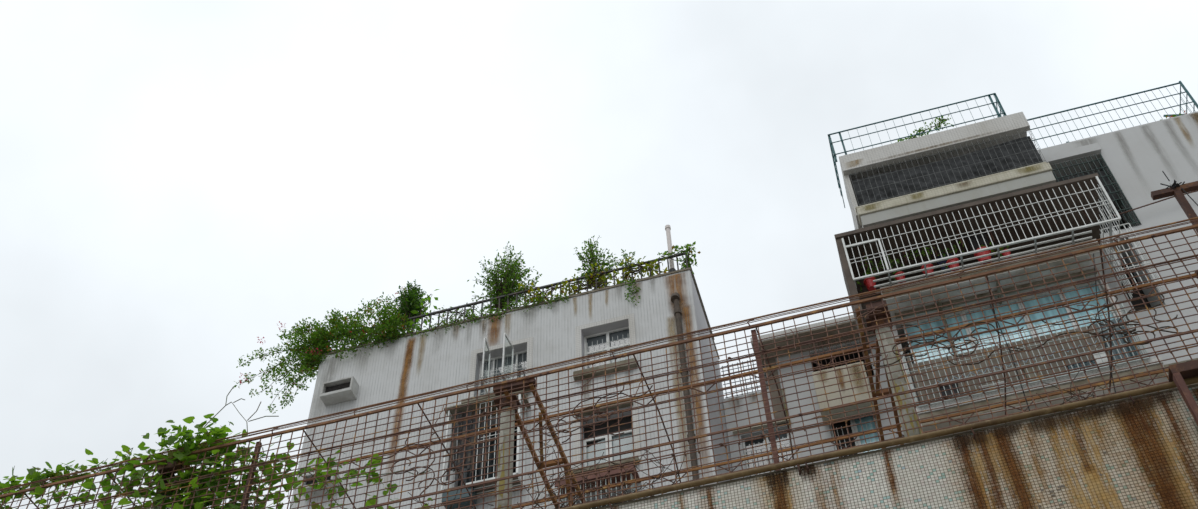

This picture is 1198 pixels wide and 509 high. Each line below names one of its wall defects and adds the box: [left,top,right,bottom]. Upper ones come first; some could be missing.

rust [391,337,424,450]
rust [668,274,704,444]
rust [759,462,841,509]
rust [884,450,899,503]
rust [953,395,1198,509]